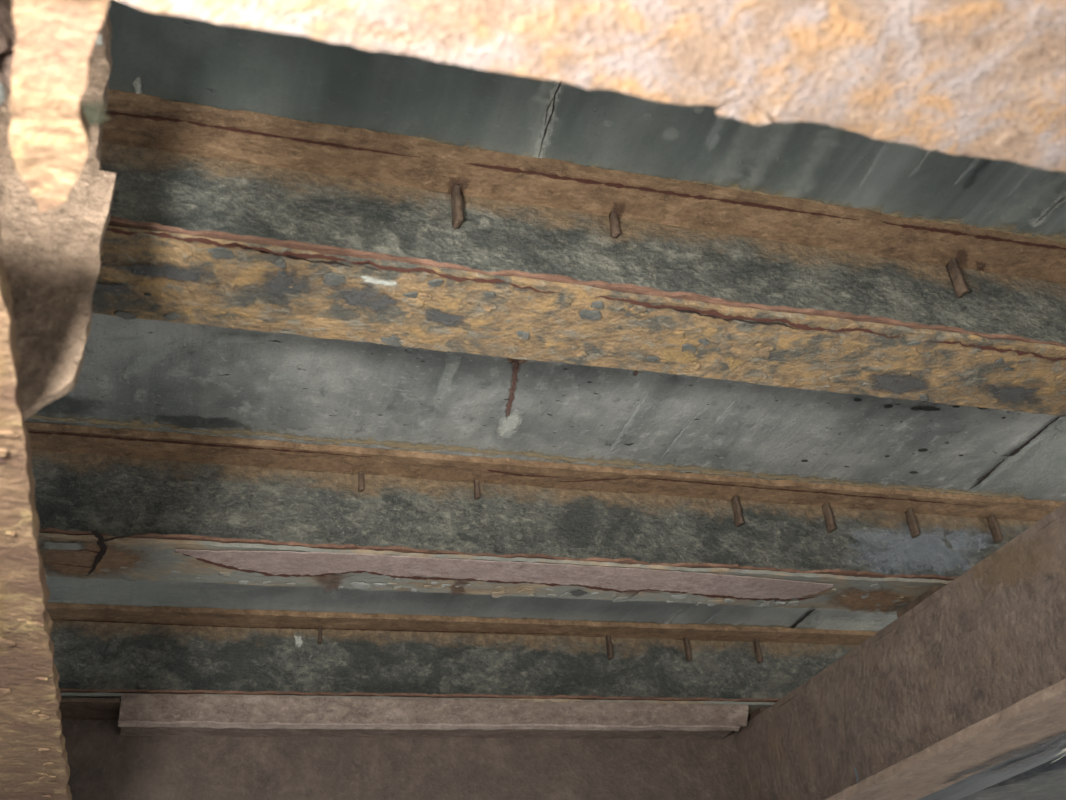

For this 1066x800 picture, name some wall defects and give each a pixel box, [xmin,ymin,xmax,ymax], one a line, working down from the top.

crack [105,110,421,158]
corrosion [716,103,772,125]
crack [464,81,1066,250]
corrosion [498,358,527,436]
crack [28,431,368,457]
crack [488,416,1060,507]
crack [51,531,128,576]